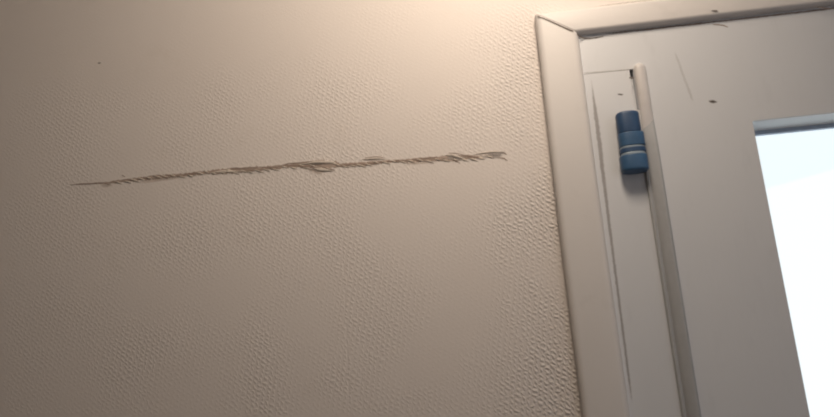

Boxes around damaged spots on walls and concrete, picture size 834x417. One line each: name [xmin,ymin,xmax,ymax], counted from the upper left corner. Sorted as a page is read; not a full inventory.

crack [71,151,508,185]